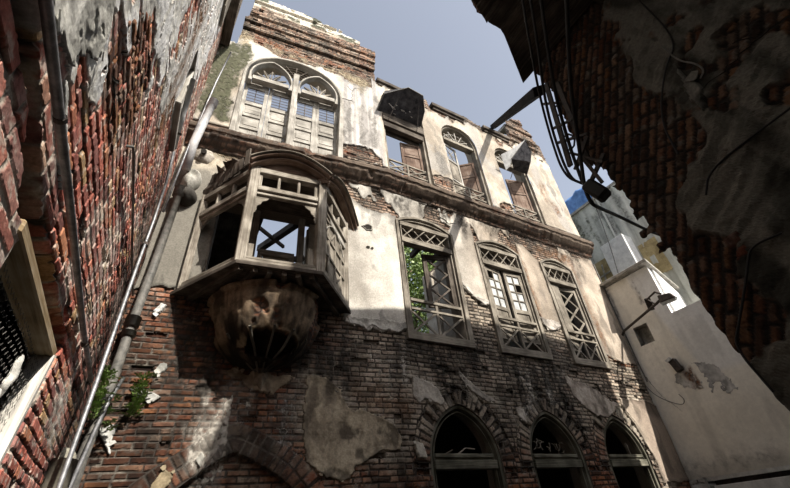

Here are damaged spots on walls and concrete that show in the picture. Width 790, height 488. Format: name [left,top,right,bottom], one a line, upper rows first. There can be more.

flaking render [53,0,152,160]
water stain [218,99,232,121]
flaking render [347,315,407,333]
flaking render [540,317,561,331]
flaking render [129,388,161,403]
flaking render [154,363,168,377]
flaking render [411,376,446,405]
flaking render [563,376,619,418]
peeling [675,362,738,394]
flaking render [99,424,117,455]
flaking render [302,375,402,482]
flaking render [150,465,175,488]